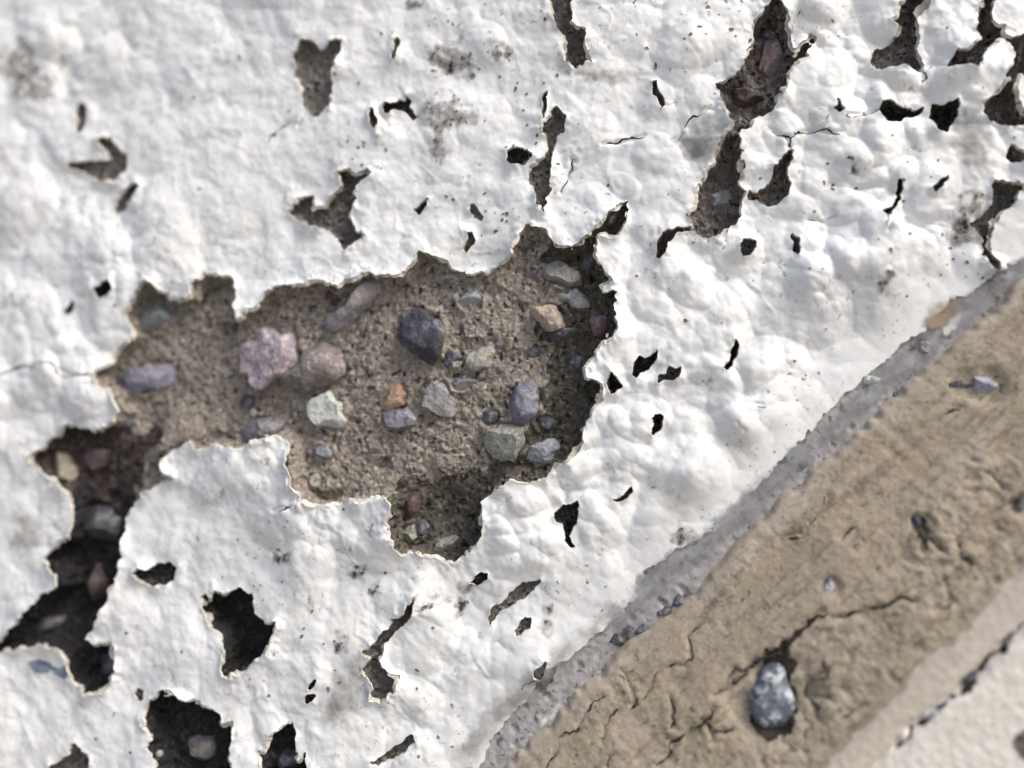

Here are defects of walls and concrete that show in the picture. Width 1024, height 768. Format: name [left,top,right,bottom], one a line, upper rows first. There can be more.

peeling [292,38,342,117]
peeling [655,0,817,258]
peeling [870,0,931,73]
spalling [880,97,961,132]
peeling [946,0,1024,128]
spalling [0,91,682,704]
peeling [479,178,1024,768]
peeling [134,688,234,768]
crack [546,583,954,768]